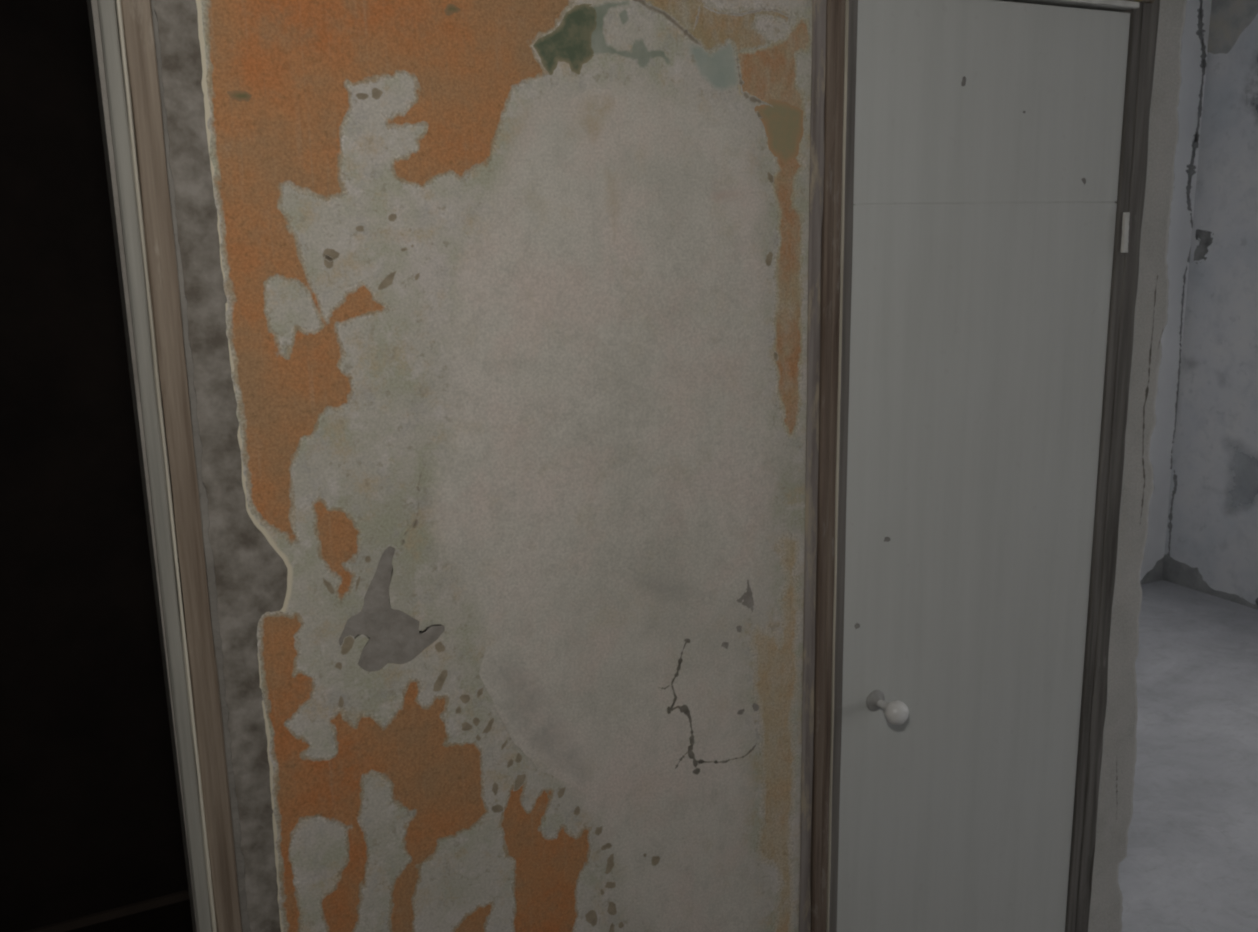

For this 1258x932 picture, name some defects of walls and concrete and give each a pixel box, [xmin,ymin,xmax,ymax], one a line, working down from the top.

peeling [533,0,671,75]
peeling [1207,0,1258,54]
peeling [355,87,384,101]
crack [1186,0,1207,228]
peeling [322,247,341,269]
peeling [377,270,398,291]
spalling [154,0,288,932]
spalling [334,546,446,672]
spalling [735,580,754,612]
peeling [455,687,495,741]
crack [658,638,757,775]
peeling [585,826,625,932]